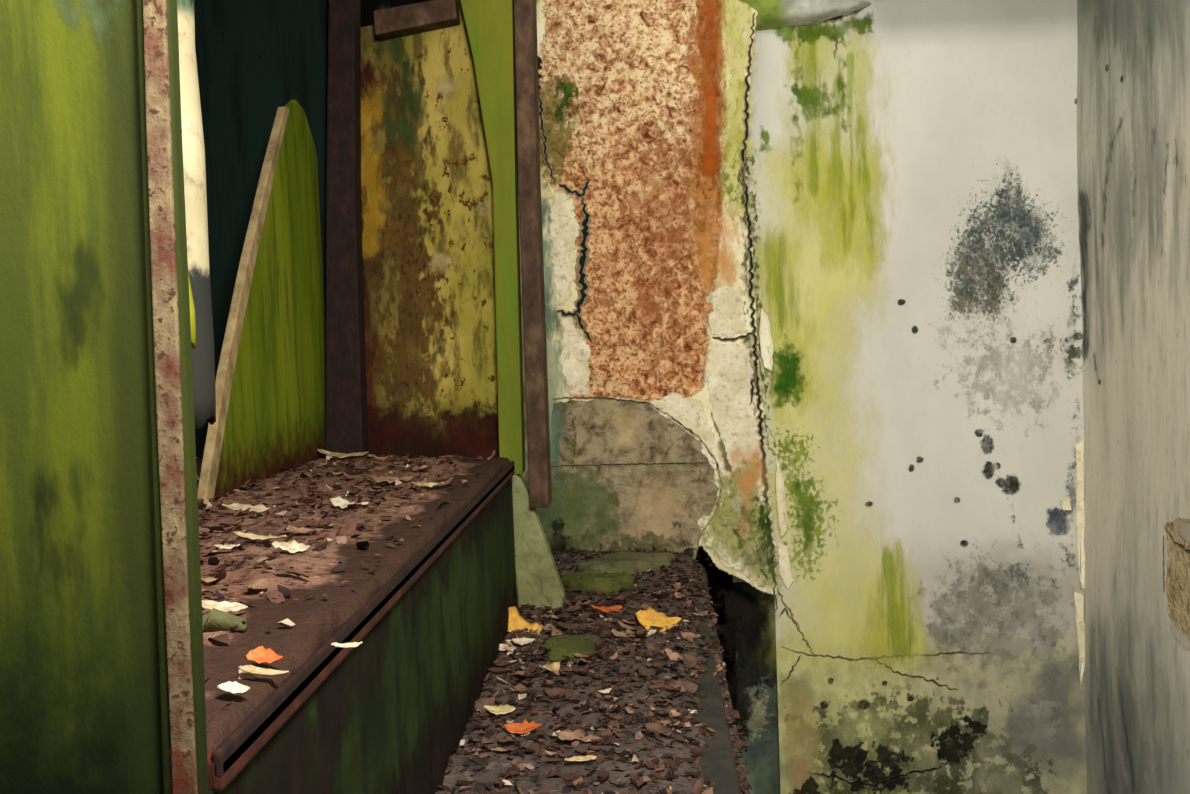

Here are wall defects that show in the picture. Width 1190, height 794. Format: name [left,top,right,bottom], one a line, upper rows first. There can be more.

rust [233,615,387,794]
rust [386,665,478,794]
rust [361,37,512,616]
crack [539,88,592,342]
spalling [538,0,794,590]
crack [713,13,995,691]
water stain [785,681,989,794]
water stain [975,430,1020,494]
water stain [941,463,1082,794]
water stain [935,170,1097,415]
peeling [1061,441,1085,690]
spalling [1163,517,1190,650]